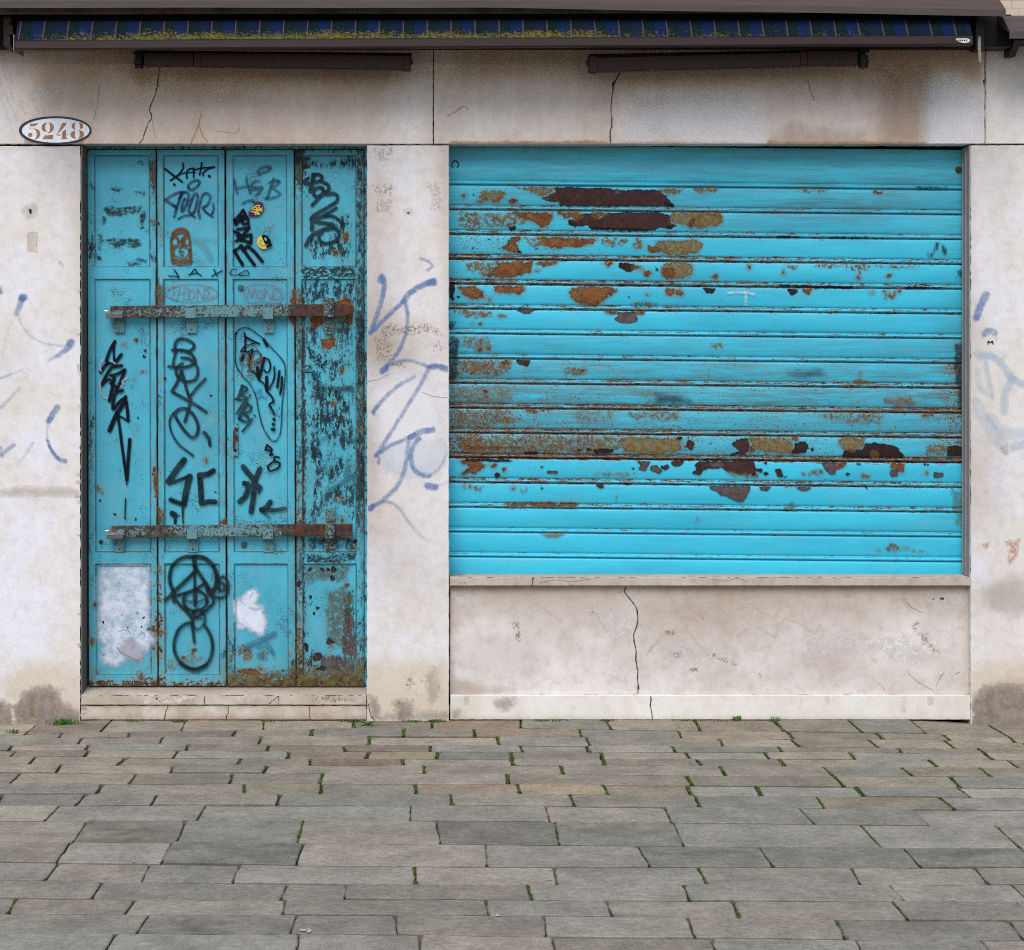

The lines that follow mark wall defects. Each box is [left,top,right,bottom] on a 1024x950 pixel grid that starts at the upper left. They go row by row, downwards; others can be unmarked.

crack [139,68,160,144]
crack [609,73,620,143]
rust [449,186,722,376]
rust [779,262,934,300]
rust [152,467,165,525]
rust [455,389,681,490]
rust [890,462,905,477]
rust [923,436,962,478]
rust [228,566,364,687]
crack [624,587,653,720]
damp [0,684,80,724]
damp [972,669,1024,726]